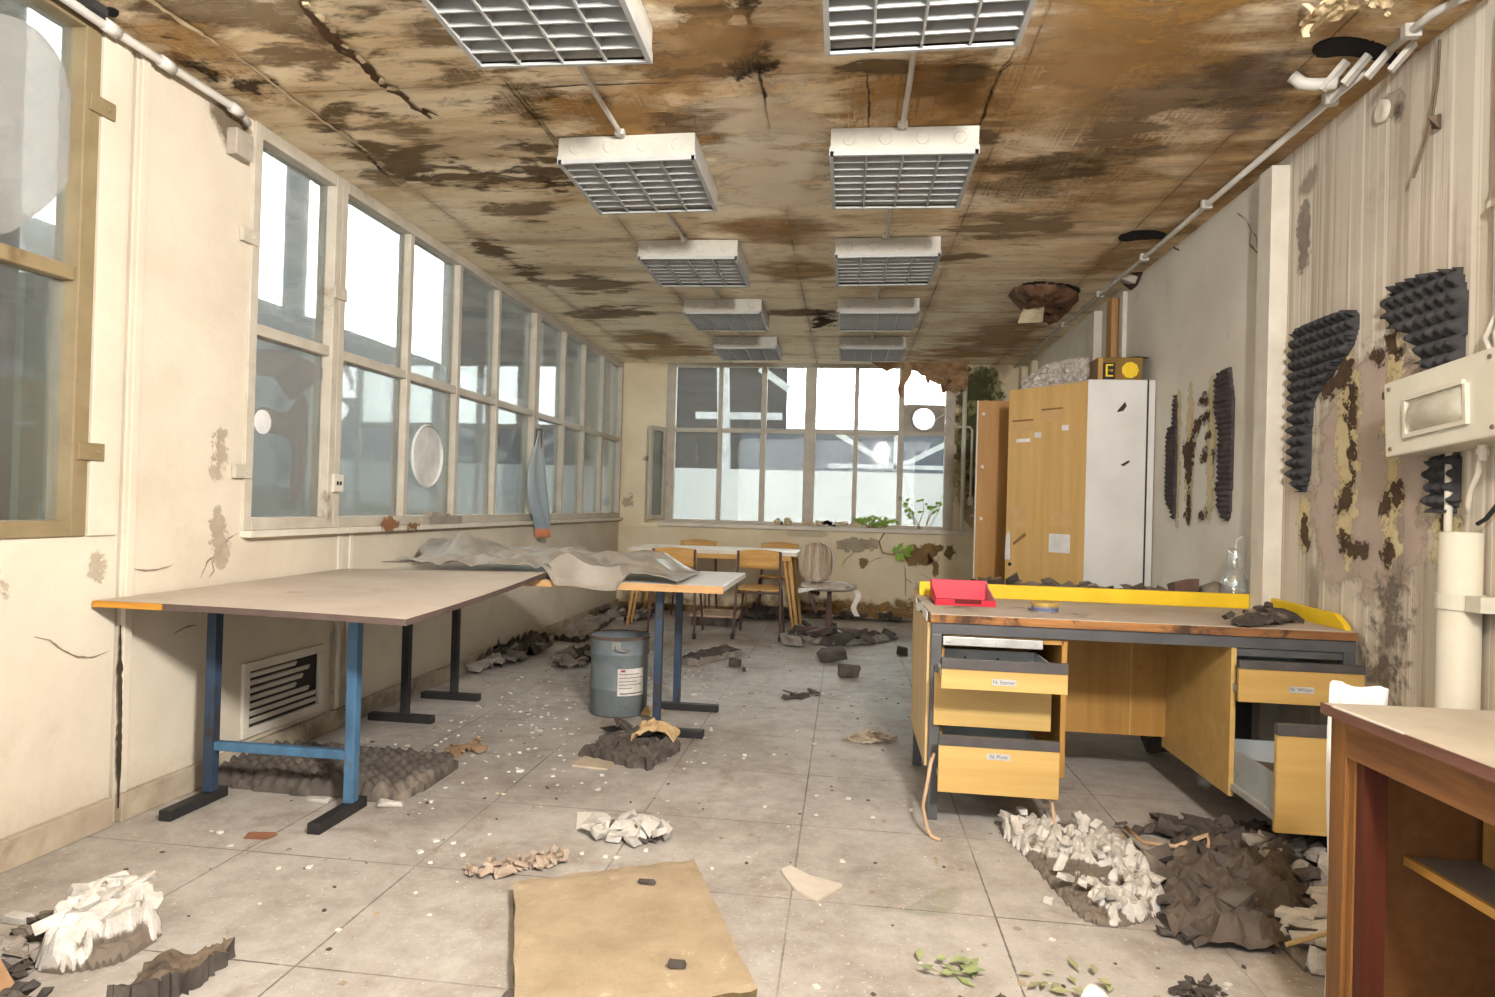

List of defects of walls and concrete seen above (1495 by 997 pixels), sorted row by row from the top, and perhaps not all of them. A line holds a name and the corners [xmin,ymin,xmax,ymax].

crack [299,0,439,119]
water stain [115,0,795,223]
crack [744,0,770,130]
water stain [828,0,1407,275]
water stain [467,237,714,358]
water stain [768,309,837,328]
spalling [904,543,956,577]
peeling [1182,391,1215,525]
peeling [1319,358,1396,571]
peeling [1378,479,1405,518]
water stain [1358,565,1415,706]
crack [36,625,123,808]